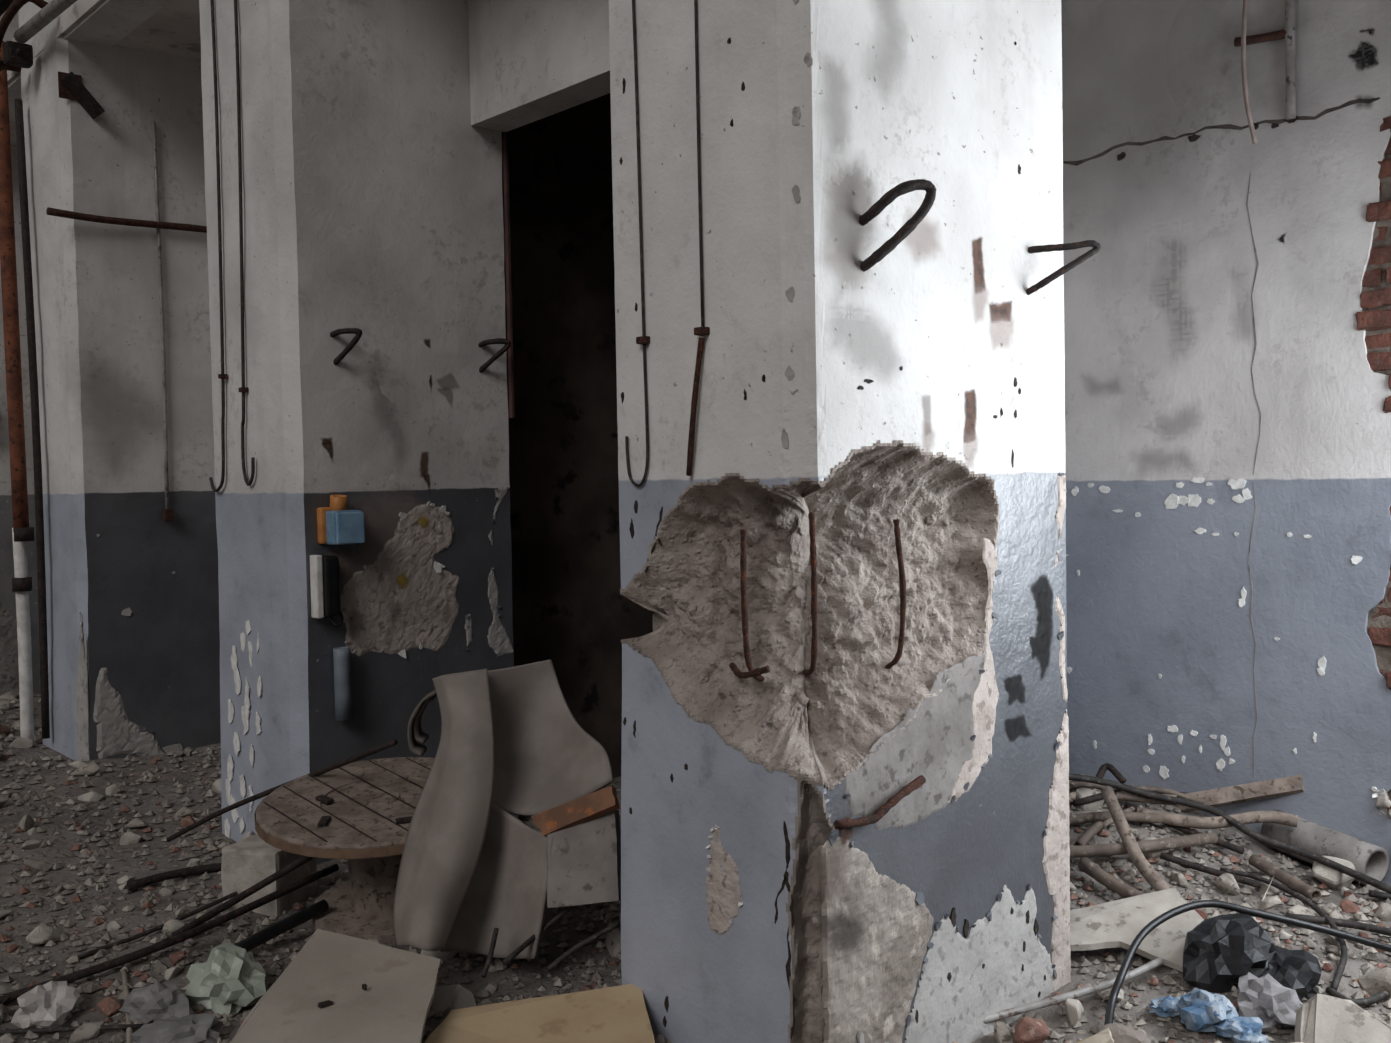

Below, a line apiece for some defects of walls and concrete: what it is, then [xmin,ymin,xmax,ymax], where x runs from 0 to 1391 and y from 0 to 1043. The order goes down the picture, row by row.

crack [1063,97,1380,166]
corrosion [973,238,1012,321]
flaking render [1355,116,1391,413]
corrosion [964,390,977,442]
peeling [76,612,183,761]
peeling [224,620,262,838]
peeling [340,501,514,659]
spalling [620,440,1072,1043]
peeling [1055,473,1110,567]
peeling [1143,725,1235,780]
peeling [1164,478,1253,509]
flaking render [1367,567,1391,689]